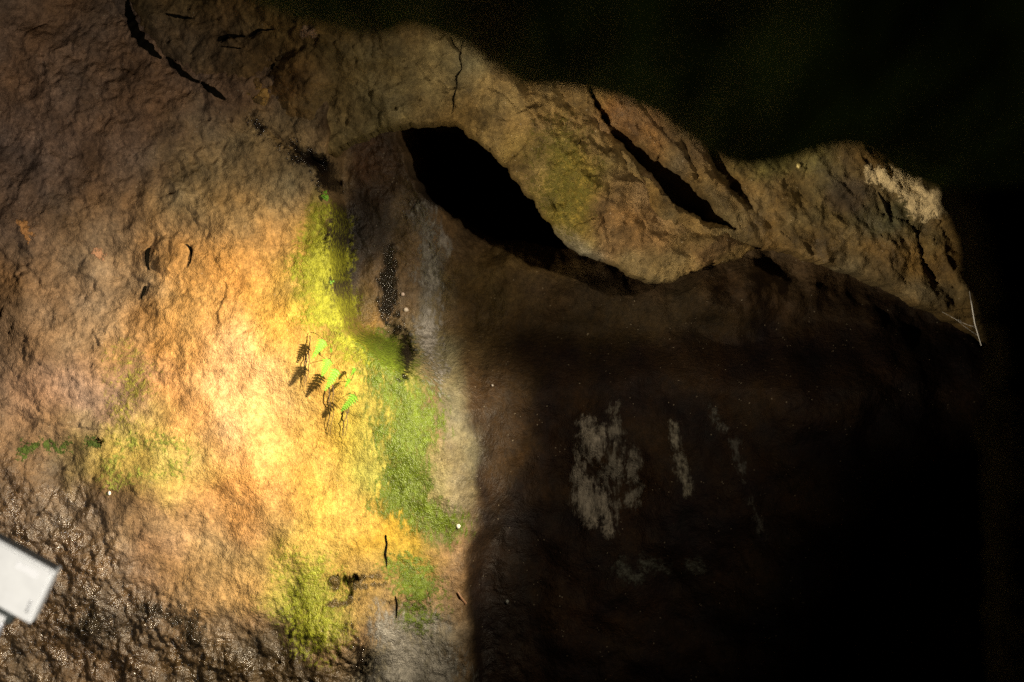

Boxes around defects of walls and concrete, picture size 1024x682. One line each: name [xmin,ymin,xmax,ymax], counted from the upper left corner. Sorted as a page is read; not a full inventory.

crack [125,0,226,100]
crack [452,45,462,112]
leakage [571,405,645,537]
leakage [668,420,692,496]